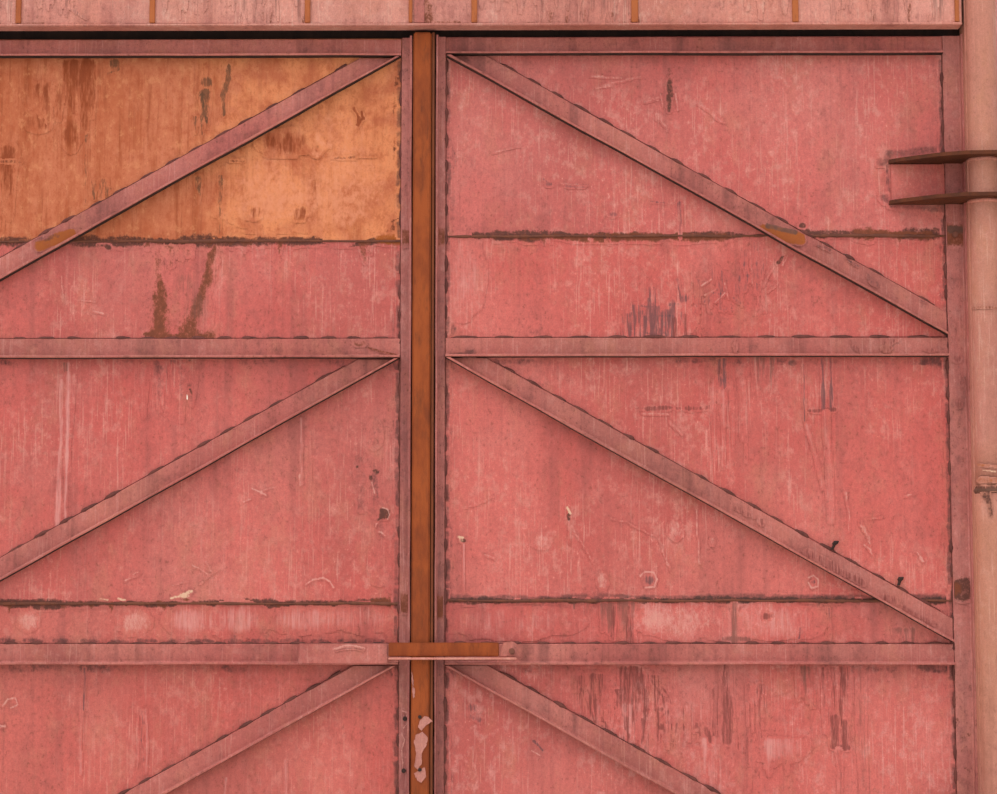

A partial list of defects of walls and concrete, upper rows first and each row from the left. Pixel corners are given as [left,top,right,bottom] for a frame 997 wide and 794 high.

corrosion [21,58,99,155]
corrosion [0,141,333,339]
corrosion [349,230,400,266]
peeling [400,710,432,783]